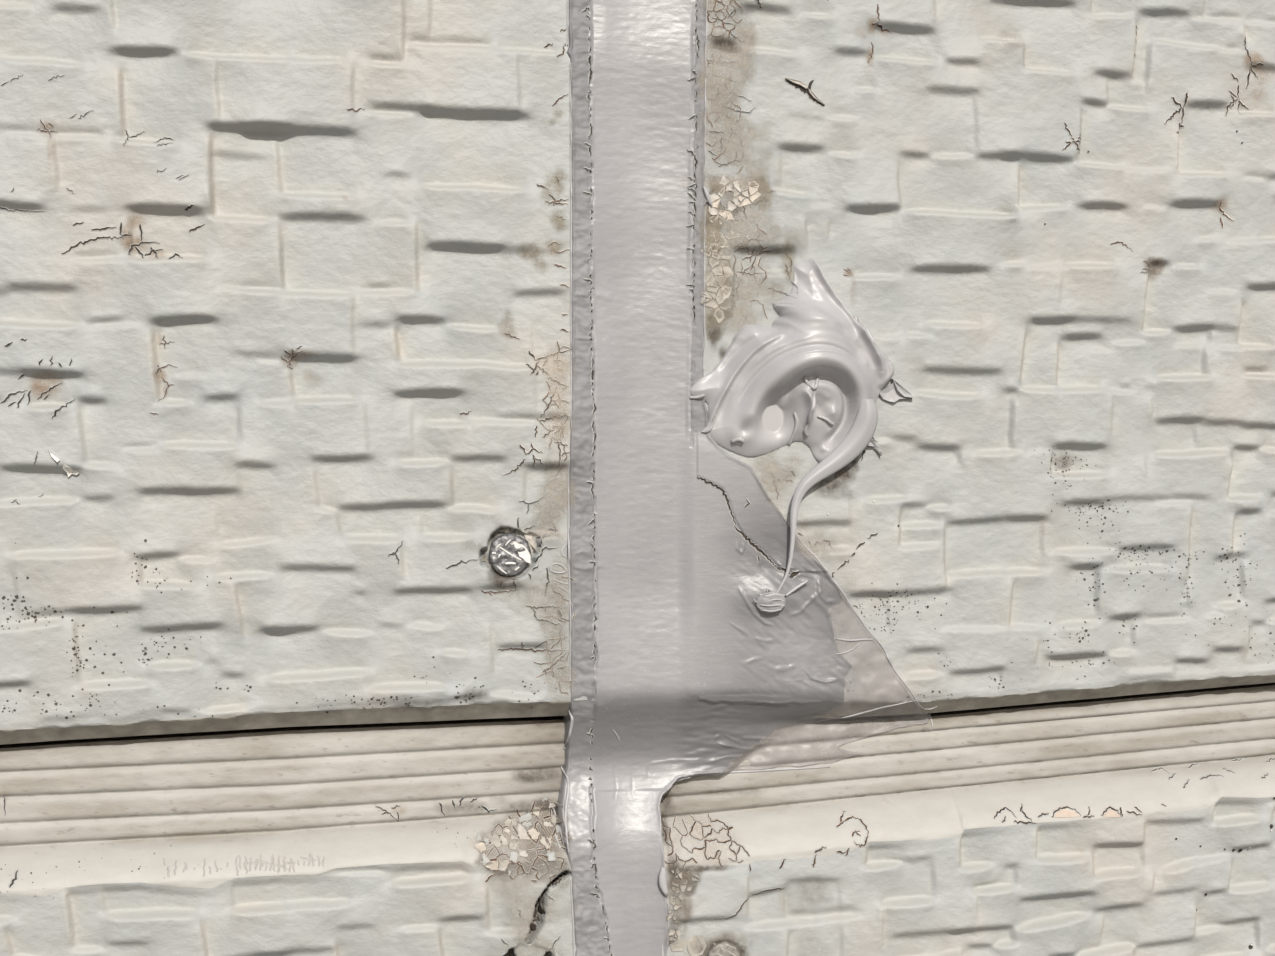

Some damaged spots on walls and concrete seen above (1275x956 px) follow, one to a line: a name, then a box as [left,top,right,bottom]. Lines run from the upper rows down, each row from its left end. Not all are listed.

crack [544,28,567,58]
crack [552,93,568,107]
crack [446,176,576,696]
leakage [1,595,124,719]
leakage [854,583,947,633]
leakage [1034,450,1205,680]
leakage [1213,533,1275,656]
peeling [993,803,1143,825]
crack [438,796,571,956]
peeling [670,935,725,956]